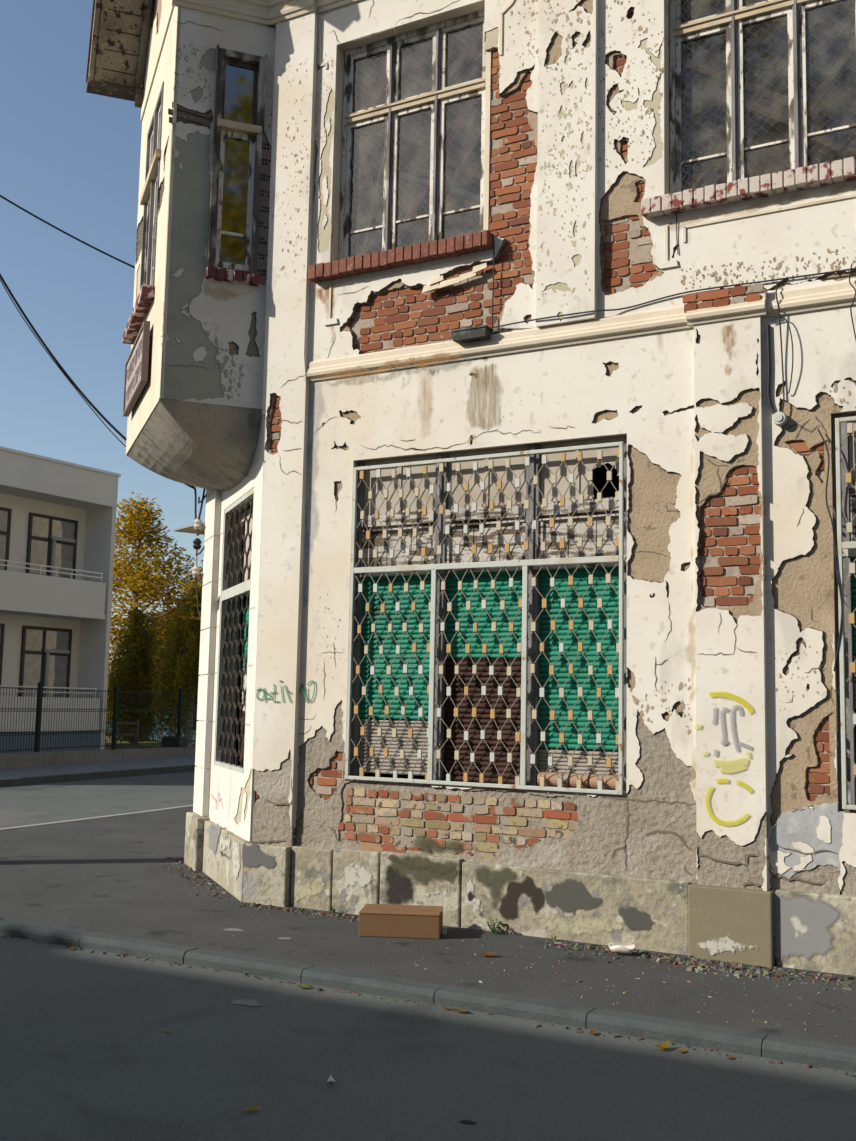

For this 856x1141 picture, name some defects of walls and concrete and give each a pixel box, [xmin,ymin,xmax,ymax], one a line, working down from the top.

flaking render [152,0,162,30]
peeling [173,43,216,103]
flaking render [341,0,666,354]
peeling [161,130,258,402]
flaking render [680,247,856,313]
flaking render [235,379,856,896]
water stain [345,855,654,935]